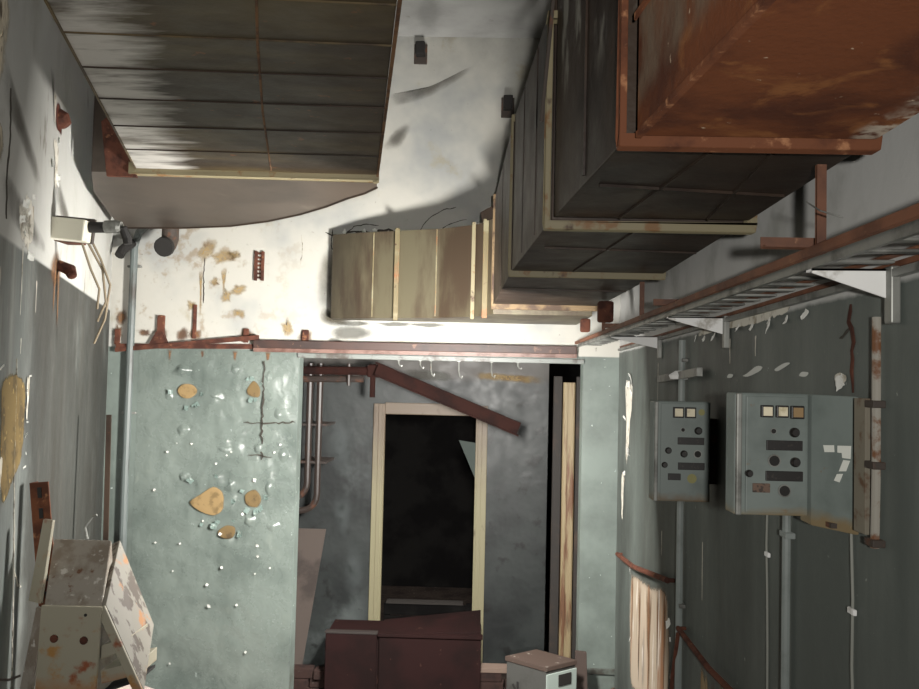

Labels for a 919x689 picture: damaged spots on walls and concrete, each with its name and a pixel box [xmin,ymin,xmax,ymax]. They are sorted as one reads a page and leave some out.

damp [200,242,239,262]
damp [189,273,244,309]